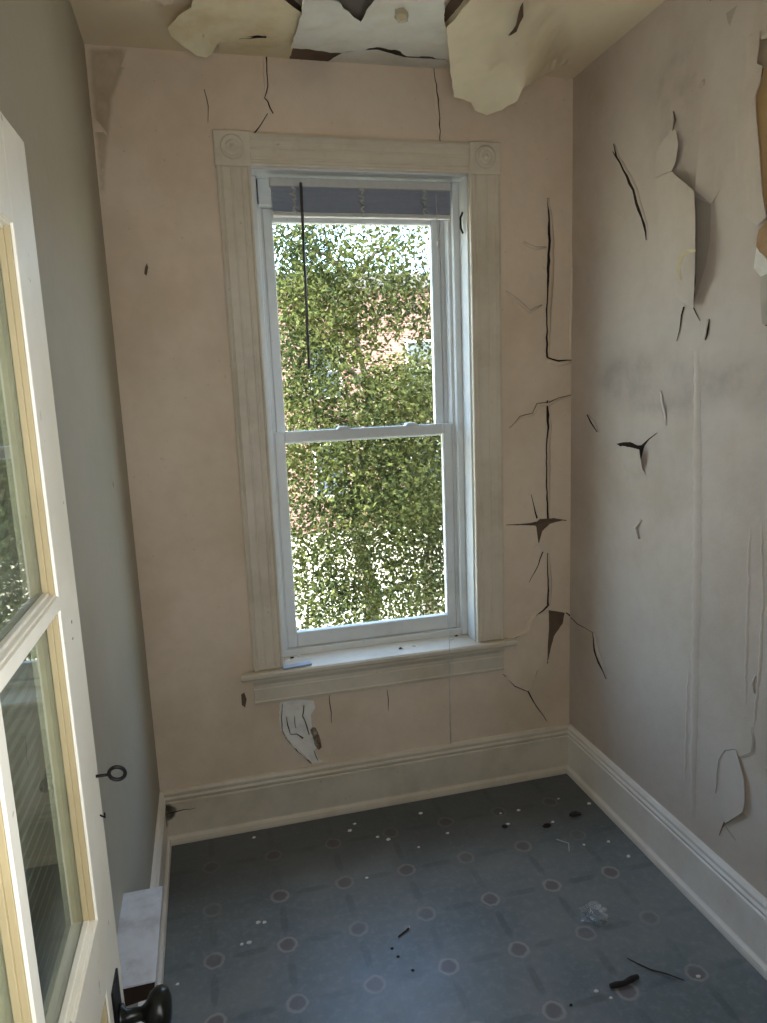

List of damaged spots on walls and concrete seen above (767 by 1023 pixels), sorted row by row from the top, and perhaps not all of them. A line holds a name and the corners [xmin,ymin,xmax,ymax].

crack [253,57,273,133]
peeling [168,0,581,116]
crack [612,144,648,240]
crack [505,198,572,367]
crack [503,395,607,721]
spalling [279,700,324,763]